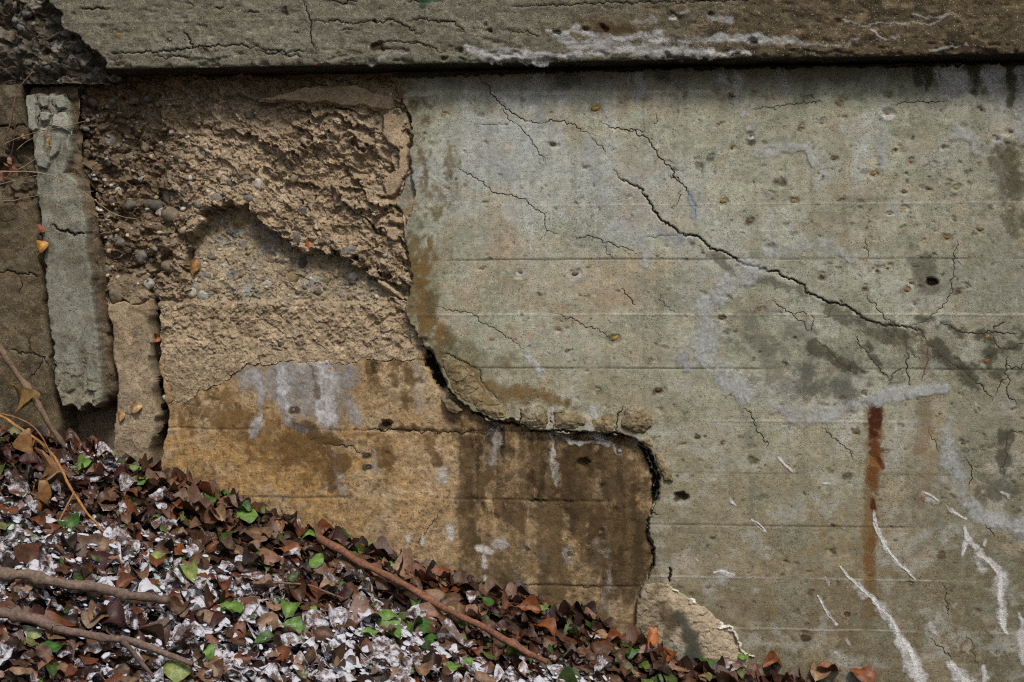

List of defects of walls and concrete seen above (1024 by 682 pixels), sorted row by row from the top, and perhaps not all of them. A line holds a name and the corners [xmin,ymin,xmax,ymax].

spalling [0,0,423,406]
crack [453,77,1024,405]
crack [436,306,524,349]
leakage [179,360,378,496]
leakage [372,445,395,485]
leakage [390,235,651,626]
rust [865,394,885,510]
leakage [975,429,1019,504]
efflorescence [840,566,928,682]
efflorescence [873,510,915,579]
efflorescence [947,661,989,682]
leakage [950,508,1024,664]